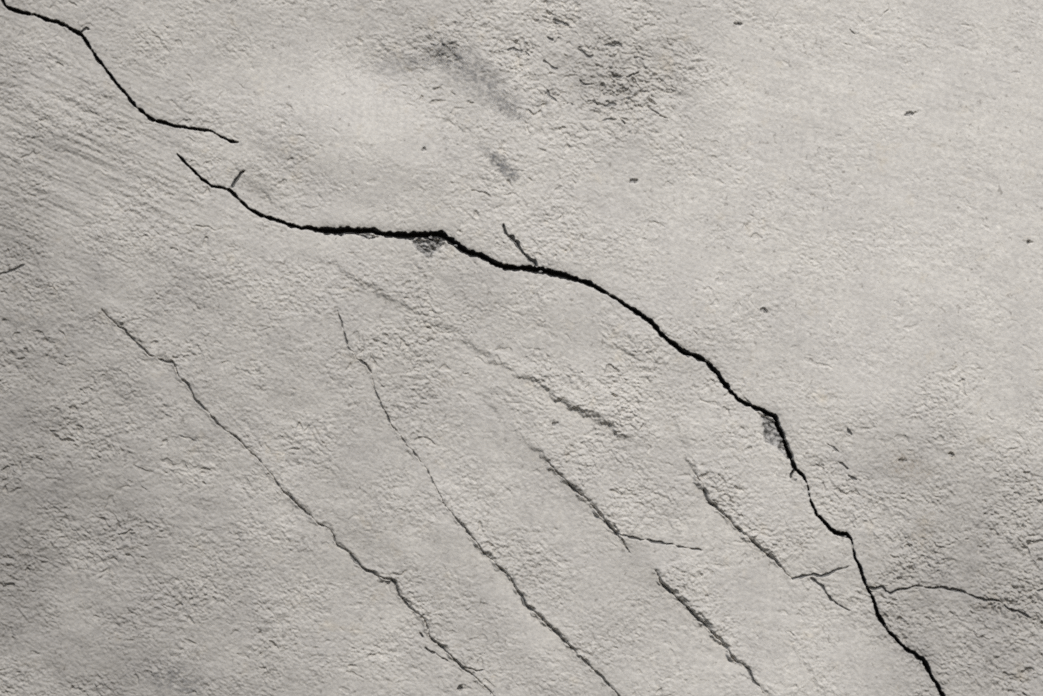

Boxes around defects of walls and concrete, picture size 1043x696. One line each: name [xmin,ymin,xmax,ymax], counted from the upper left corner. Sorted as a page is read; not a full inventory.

crack [1,0,235,143]
crack [118,326,261,462]
crack [178,155,1029,696]